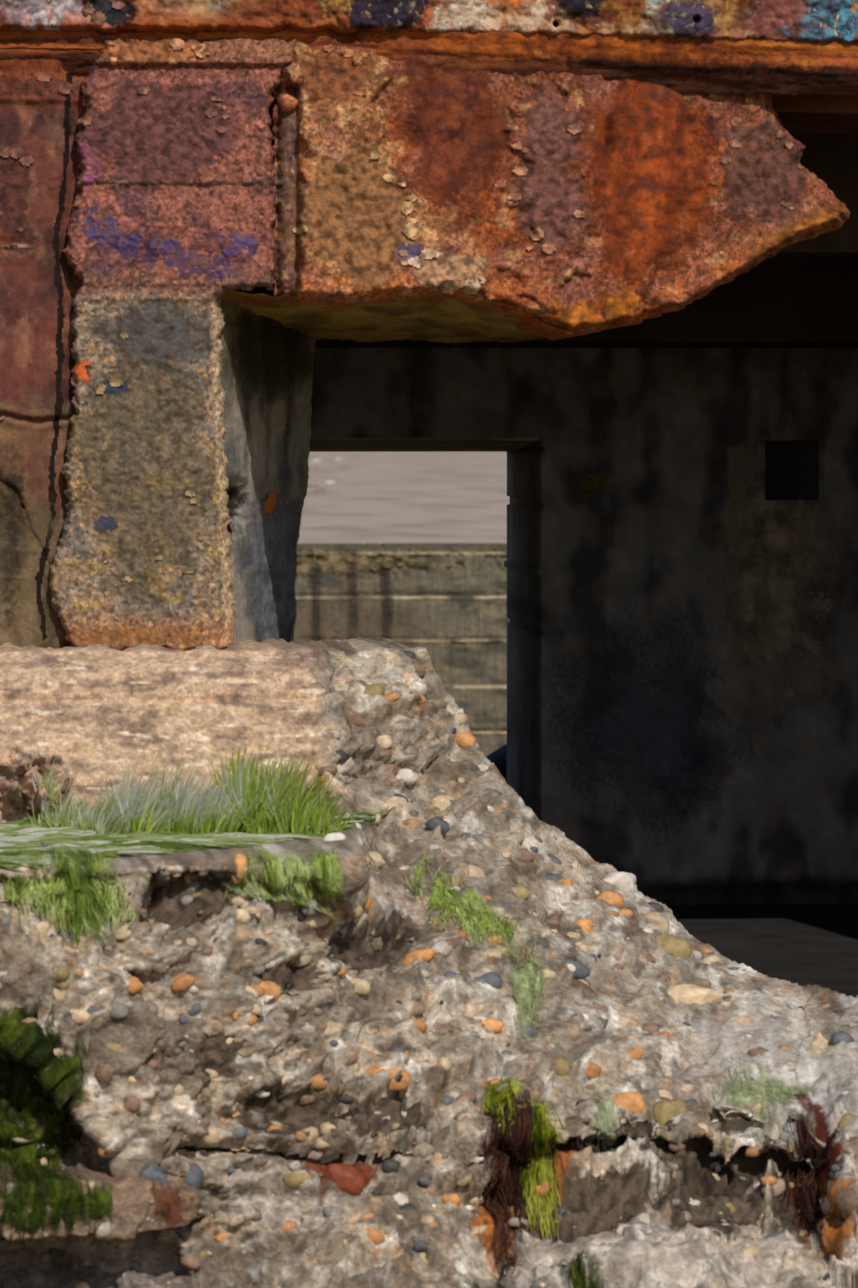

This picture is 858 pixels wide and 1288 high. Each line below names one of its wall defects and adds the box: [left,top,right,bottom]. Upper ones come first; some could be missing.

corrosion [271,0,354,29]
corrosion [364,0,858,330]
crack [175,1145,413,1166]
crack [546,1135,634,1153]